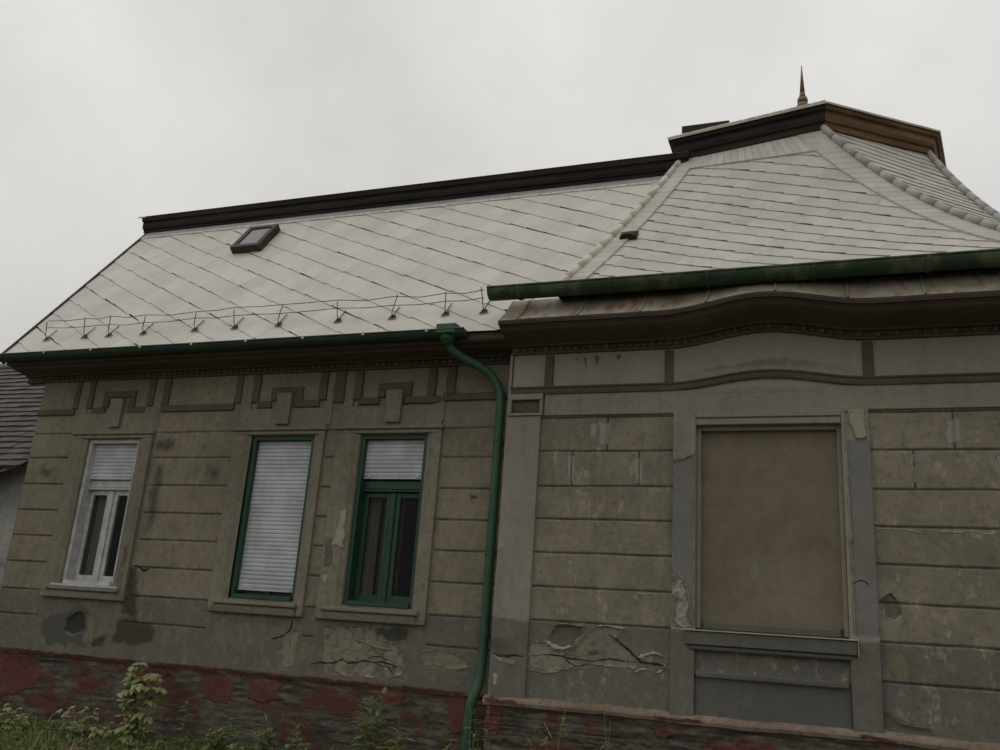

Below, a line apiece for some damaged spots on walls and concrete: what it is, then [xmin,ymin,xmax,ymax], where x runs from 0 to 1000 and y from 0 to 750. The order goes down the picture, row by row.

flaking render [322,510,348,584]
damp [1,569,460,695]
crack [307,656,402,676]
flaking render [321,626,407,706]
flaking render [528,623,666,674]
flaking render [672,569,692,628]
flaking render [878,593,904,623]